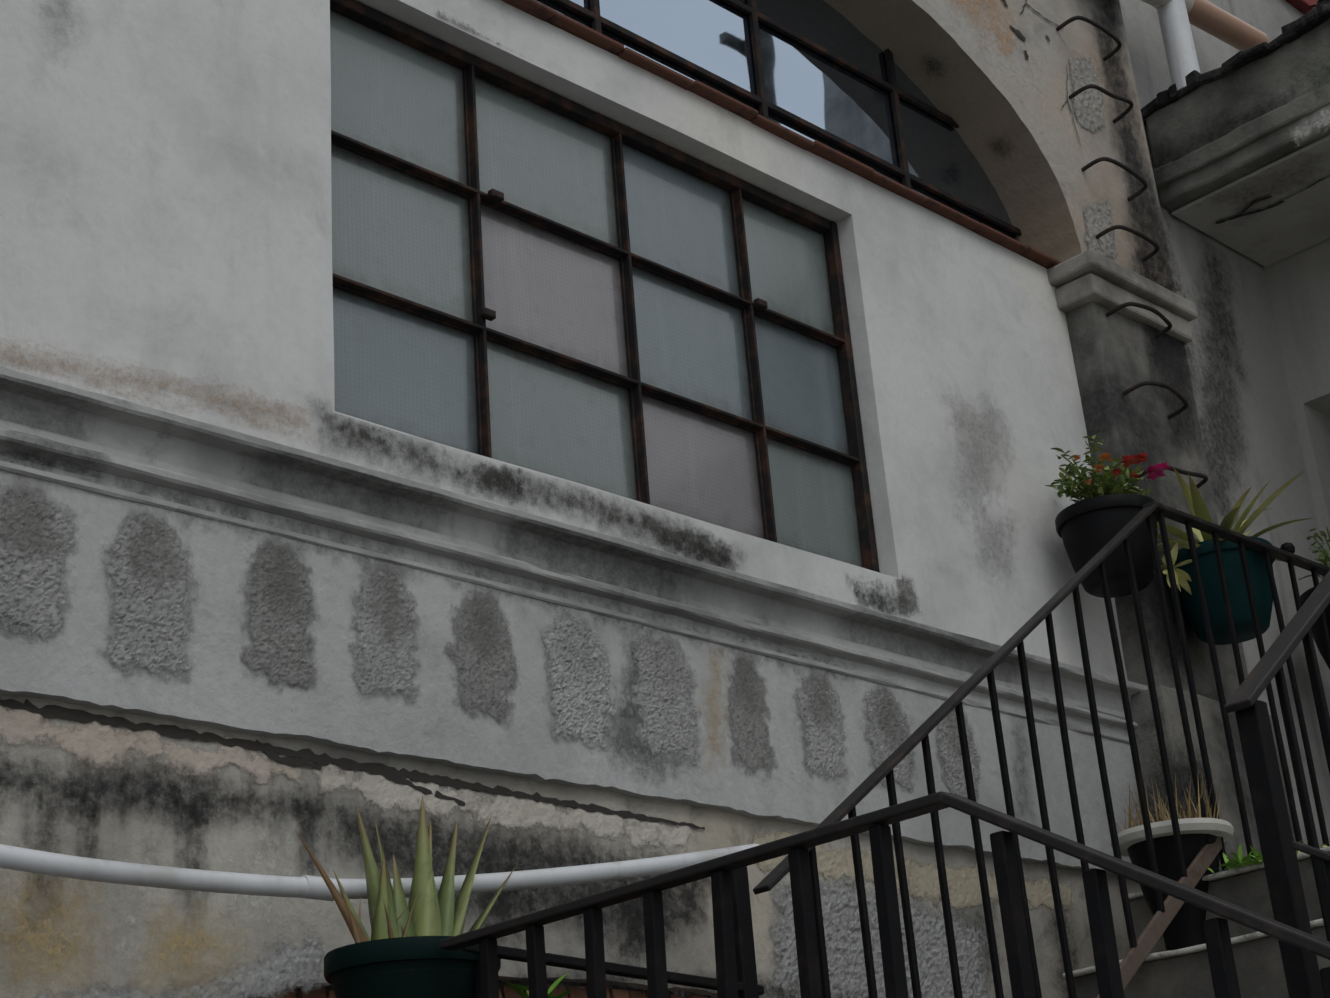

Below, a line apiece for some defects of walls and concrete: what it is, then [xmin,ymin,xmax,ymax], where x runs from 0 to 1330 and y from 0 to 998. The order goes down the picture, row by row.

water stain [1093,0,1294,292]
water stain [1148,258,1243,515]
water stain [324,414,731,566]
water stain [0,760,319,874]
peeling [0,705,691,851]
water stain [339,808,634,877]
water stain [454,874,710,958]